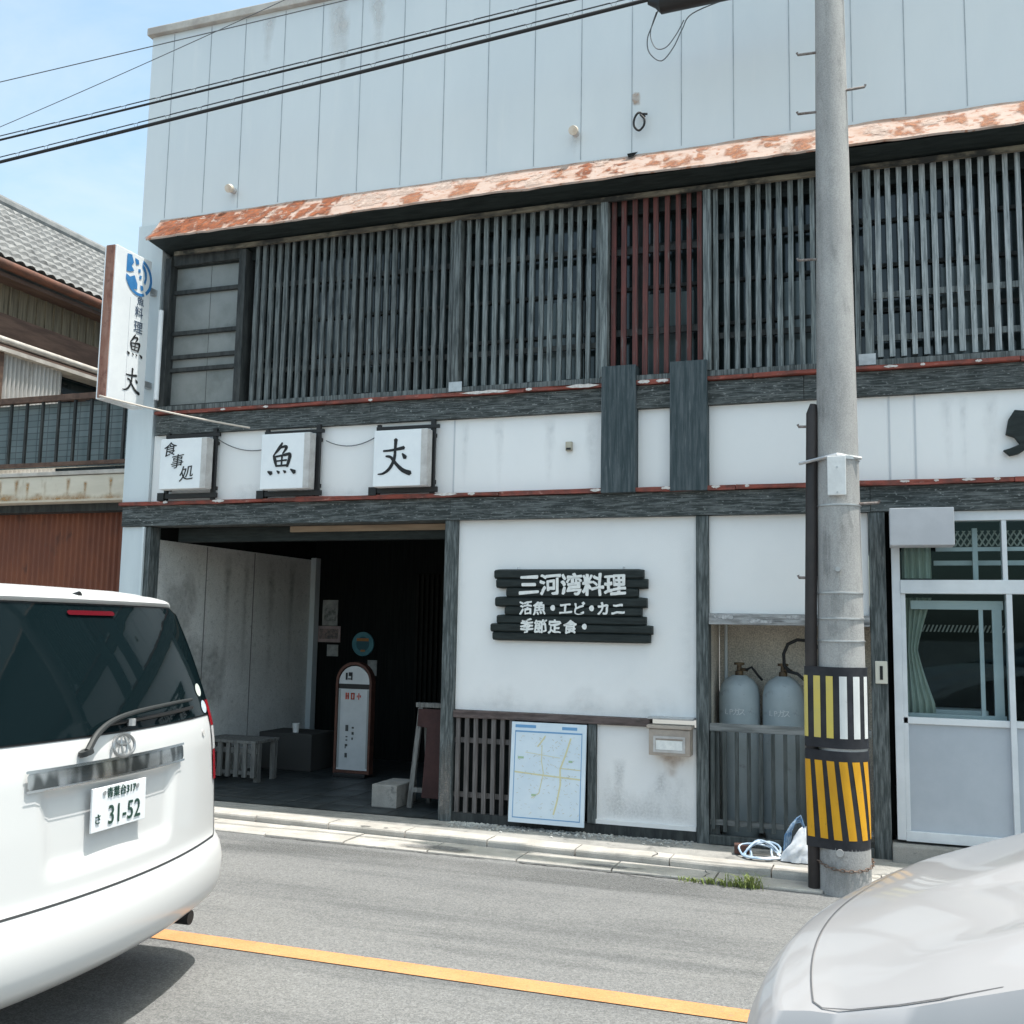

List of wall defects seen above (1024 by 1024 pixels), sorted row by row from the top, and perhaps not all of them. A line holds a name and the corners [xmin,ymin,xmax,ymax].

corrosion [981,113,999,126]
corrosion [890,120,921,135]
corrosion [760,136,815,150]
corrosion [644,147,708,167]
corrosion [725,145,747,158]
corrosion [549,163,593,180]
corrosion [449,182,478,196]
corrosion [400,191,427,204]
corrosion [146,196,341,238]